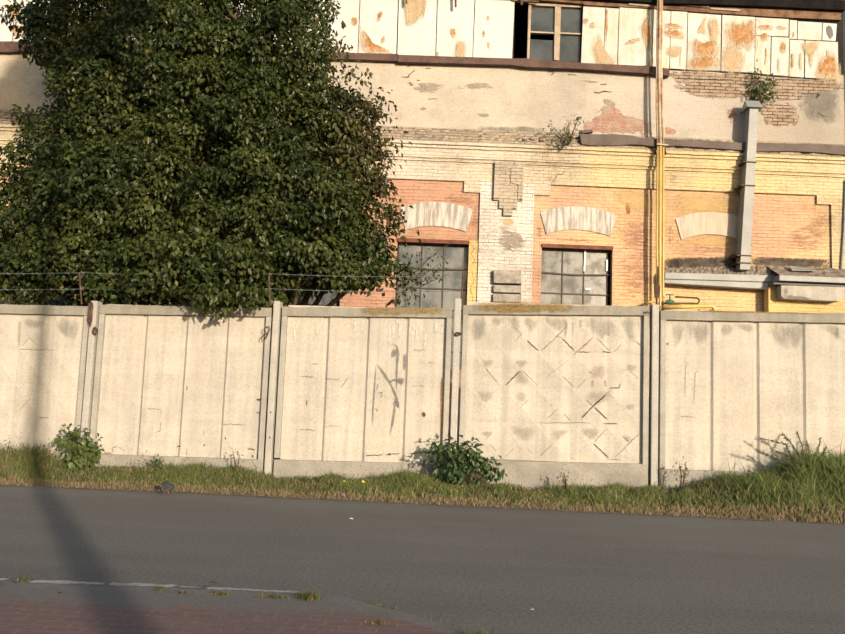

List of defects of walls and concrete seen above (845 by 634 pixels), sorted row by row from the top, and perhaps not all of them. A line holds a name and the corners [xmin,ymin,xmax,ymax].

rust [404,0,426,23]
rust [360,31,392,54]
rust [451,29,466,57]
rust [594,9,615,64]
rust [627,11,653,66]
rust [665,18,794,74]
rust [778,42,840,81]
spalling [584,99,653,135]
spalling [669,71,844,126]
damp [805,91,836,120]